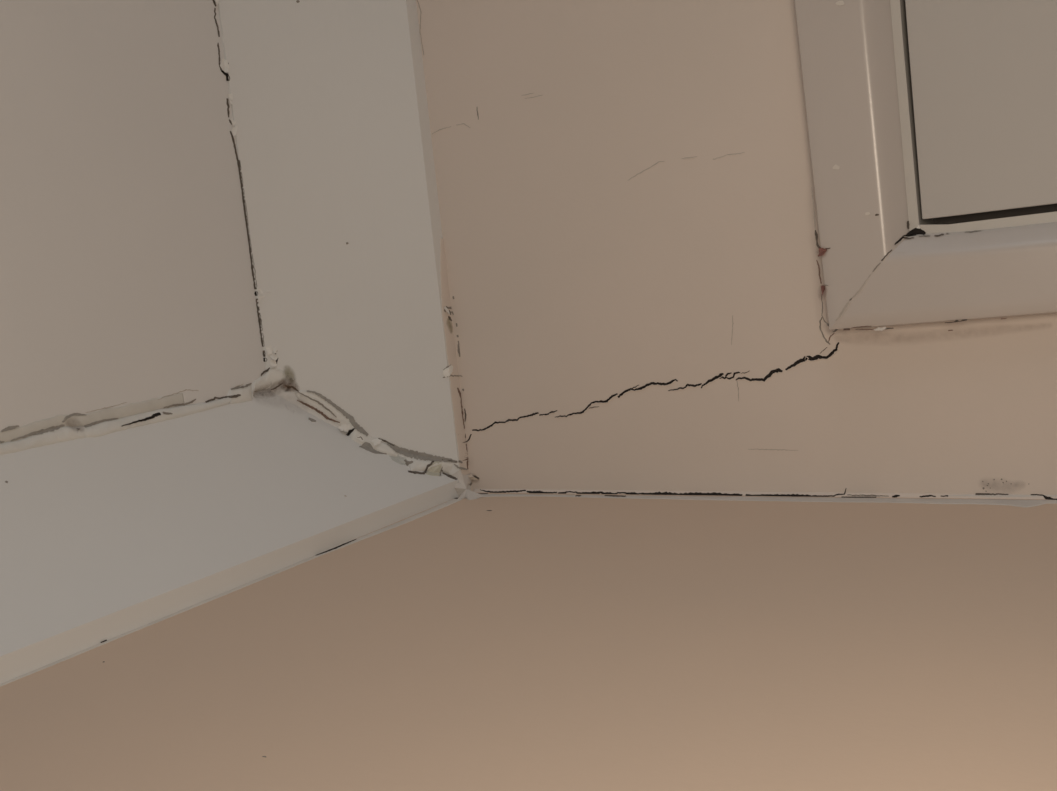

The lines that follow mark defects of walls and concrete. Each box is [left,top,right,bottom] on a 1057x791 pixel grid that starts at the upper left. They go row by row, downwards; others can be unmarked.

crack [0,0,278,443]
peeling [359,442,387,454]
crack [297,187,948,499]
crack [975,492,1057,500]